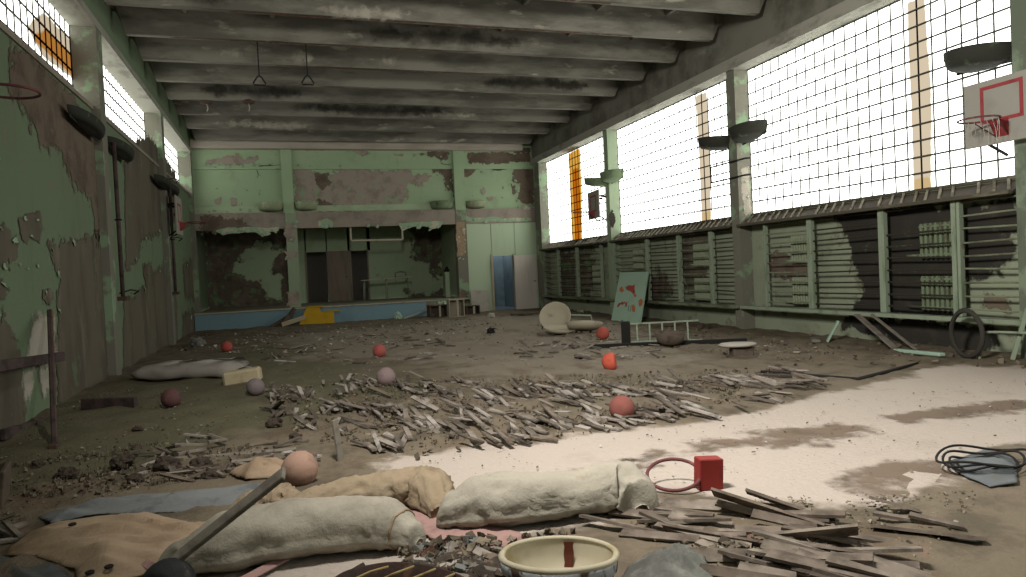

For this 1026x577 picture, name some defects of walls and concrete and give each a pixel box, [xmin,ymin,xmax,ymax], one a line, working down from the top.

damp [331,5,509,44]
damp [487,77,578,89]
peeling [394,151,450,161]
peeling [123,132,176,287]
peeling [292,169,431,228]
peeling [398,221,443,231]
peeling [456,221,466,260]
peeling [464,169,534,210]
peeling [0,210,108,429]
damp [885,400,1026,423]
damp [687,424,874,451]
damp [841,461,963,497]